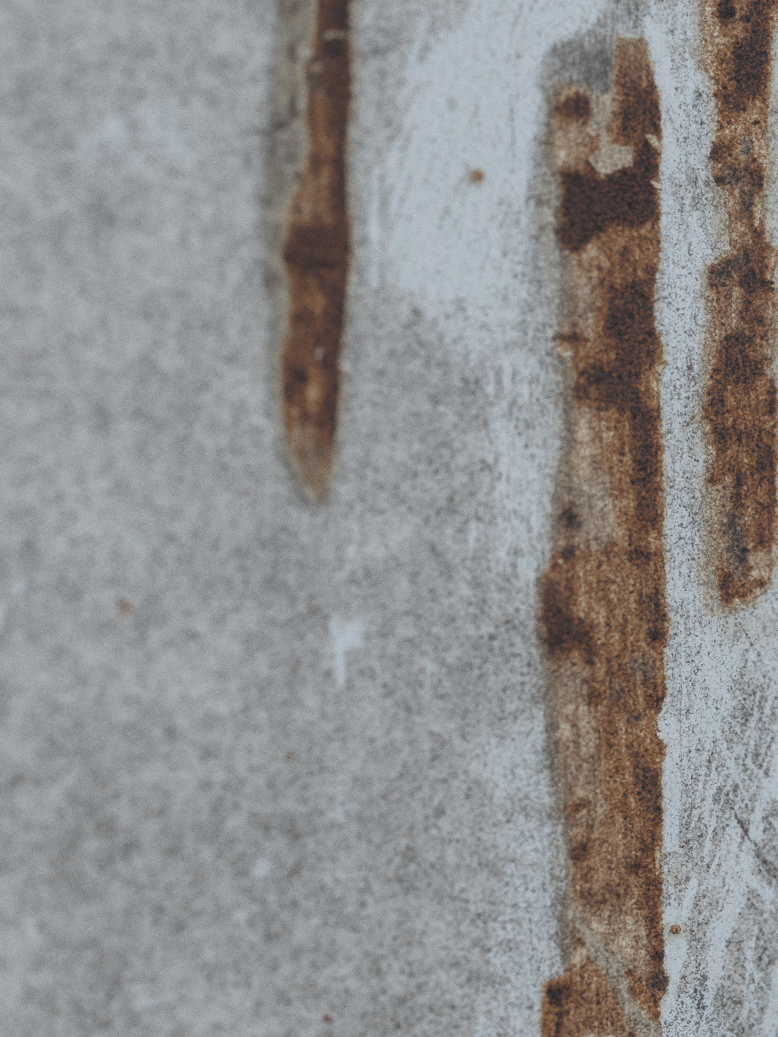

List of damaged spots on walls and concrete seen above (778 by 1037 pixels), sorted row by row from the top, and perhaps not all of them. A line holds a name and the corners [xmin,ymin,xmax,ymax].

rust [243,0,378,521]
rust [525,0,778,1037]